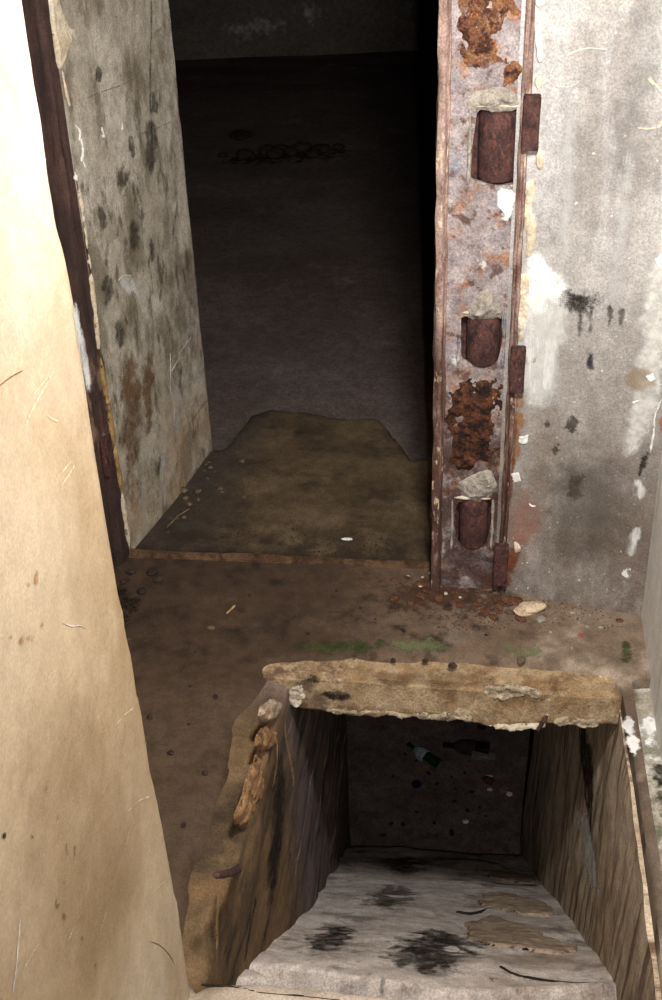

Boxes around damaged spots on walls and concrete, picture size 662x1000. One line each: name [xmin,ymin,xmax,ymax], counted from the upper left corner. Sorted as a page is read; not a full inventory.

flaking render [48,0,76,107]
rust [456,0,522,87]
damp [129,93,158,170]
damp [117,169,129,190]
damp [130,221,154,260]
damp [101,276,113,304]
damp [115,323,124,348]
rust [444,378,503,470]
rust [510,395,524,500]